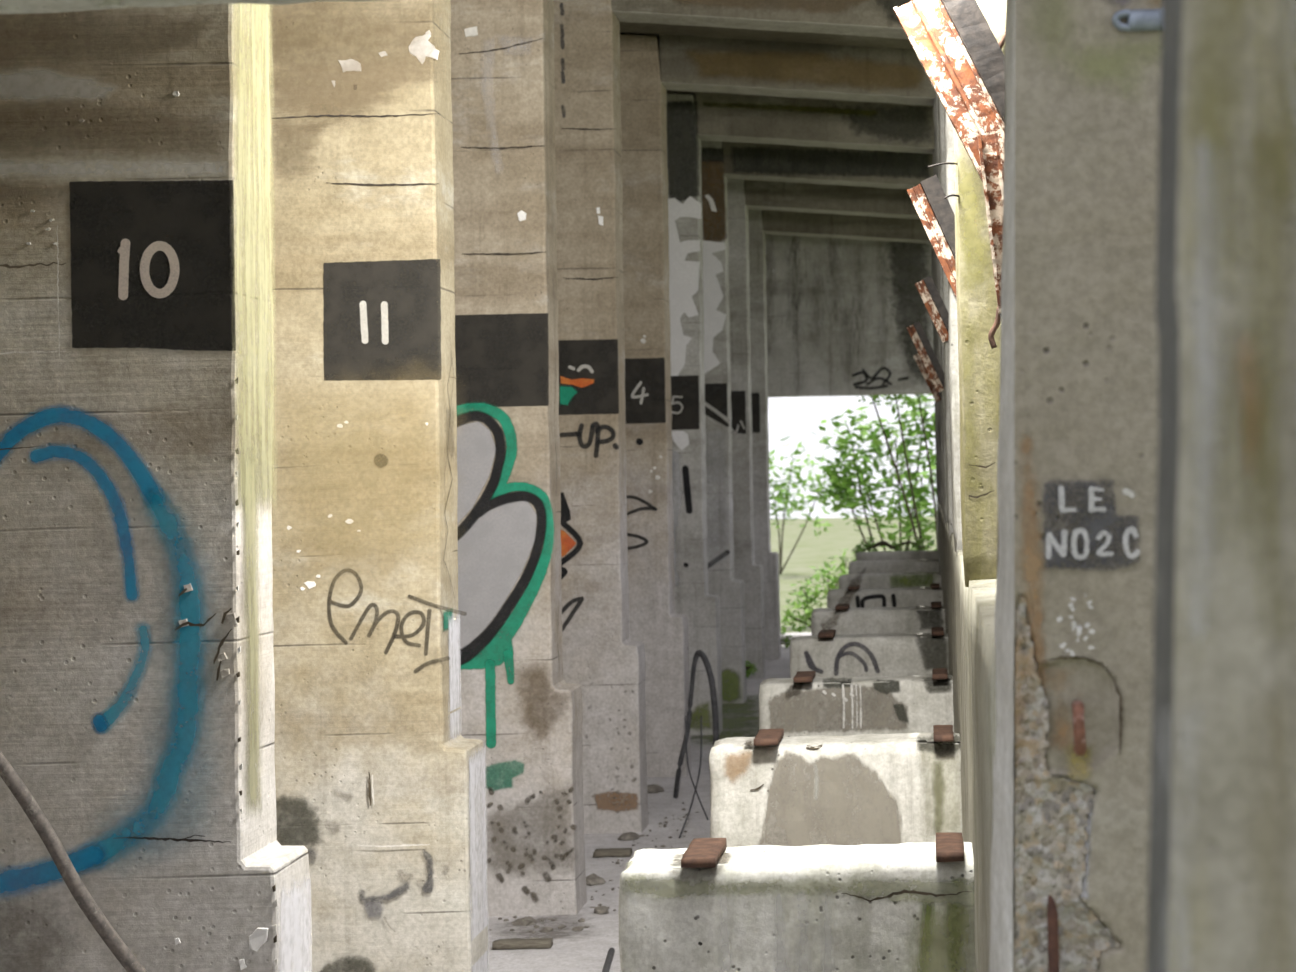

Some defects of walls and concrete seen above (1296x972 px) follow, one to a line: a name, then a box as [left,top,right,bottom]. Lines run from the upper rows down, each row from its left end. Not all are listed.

leakage [0,13,192,65]
crack [0,226,65,357]
leakage [769,508,974,832]
leakage [760,754,901,846]
spalling [1014,596,1121,972]
leakage [916,880,971,972]
corrosion [1047,895,1059,972]